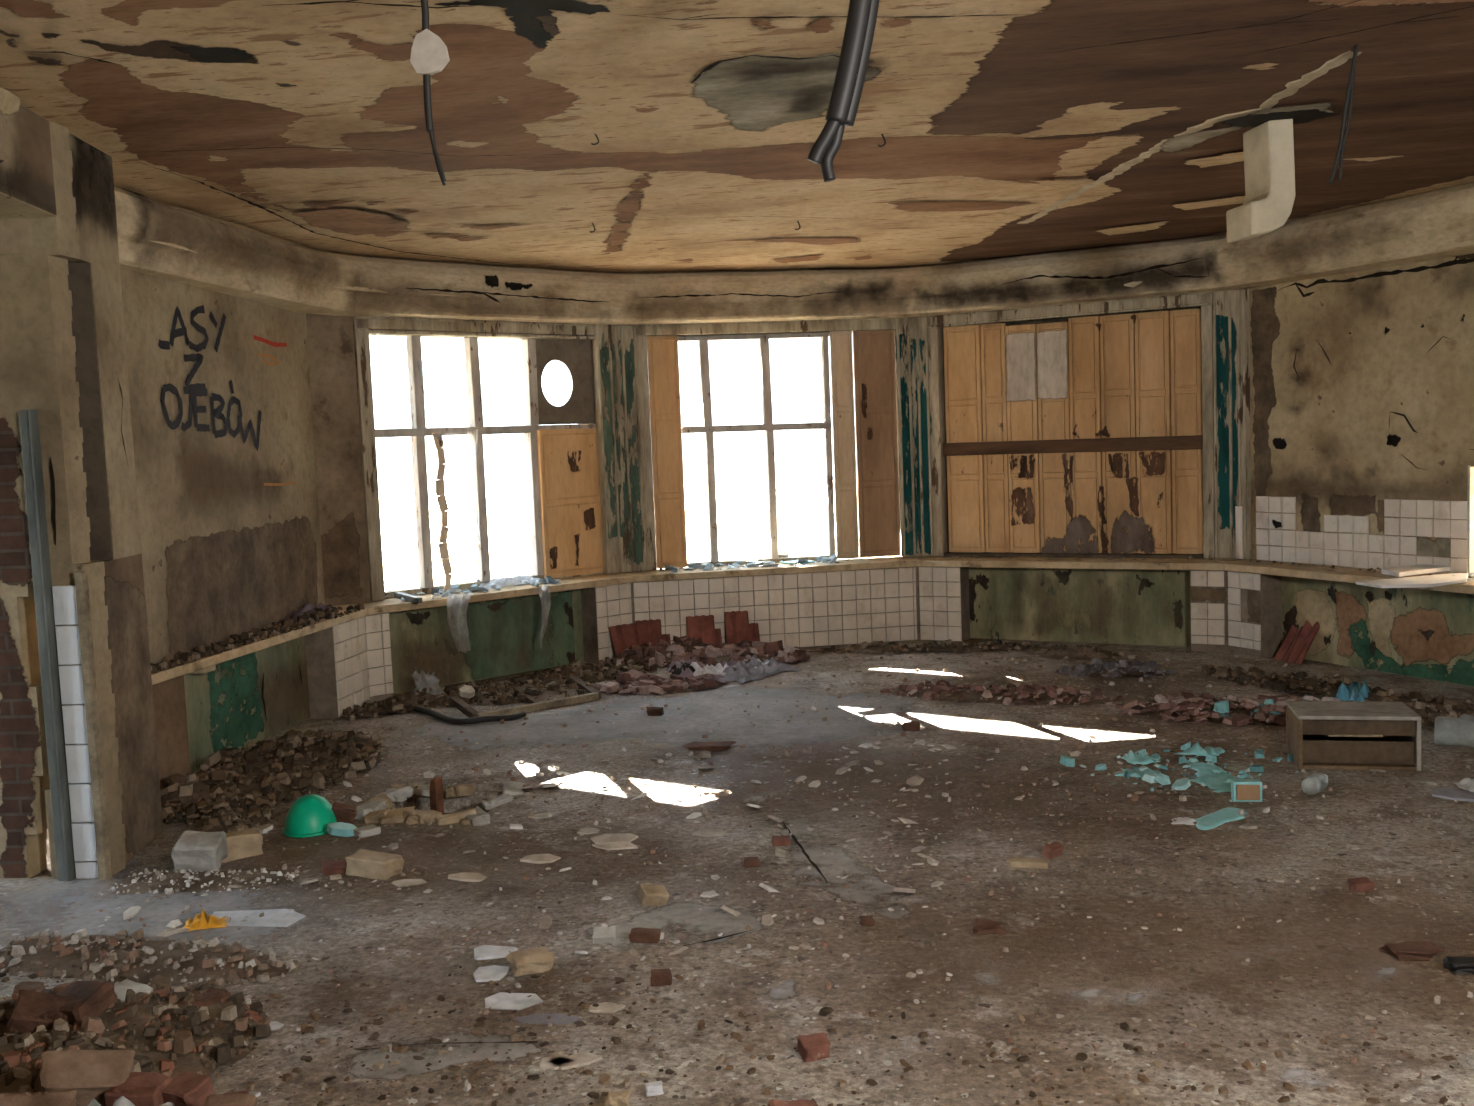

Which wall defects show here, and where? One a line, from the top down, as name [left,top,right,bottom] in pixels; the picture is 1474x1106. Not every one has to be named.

peeling [0,0,1474,263]
damp [692,54,840,131]
flaking render [0,418,41,878]
spalling [105,576,163,855]
spalling [165,513,362,658]
peeling [574,339,643,566]
peeling [895,334,932,556]
damp [807,254,1216,310]
peeling [1006,329,1068,402]
peeling [1042,424,1166,585]
spalling [1216,287,1287,530]
peeling [1300,494,1391,532]